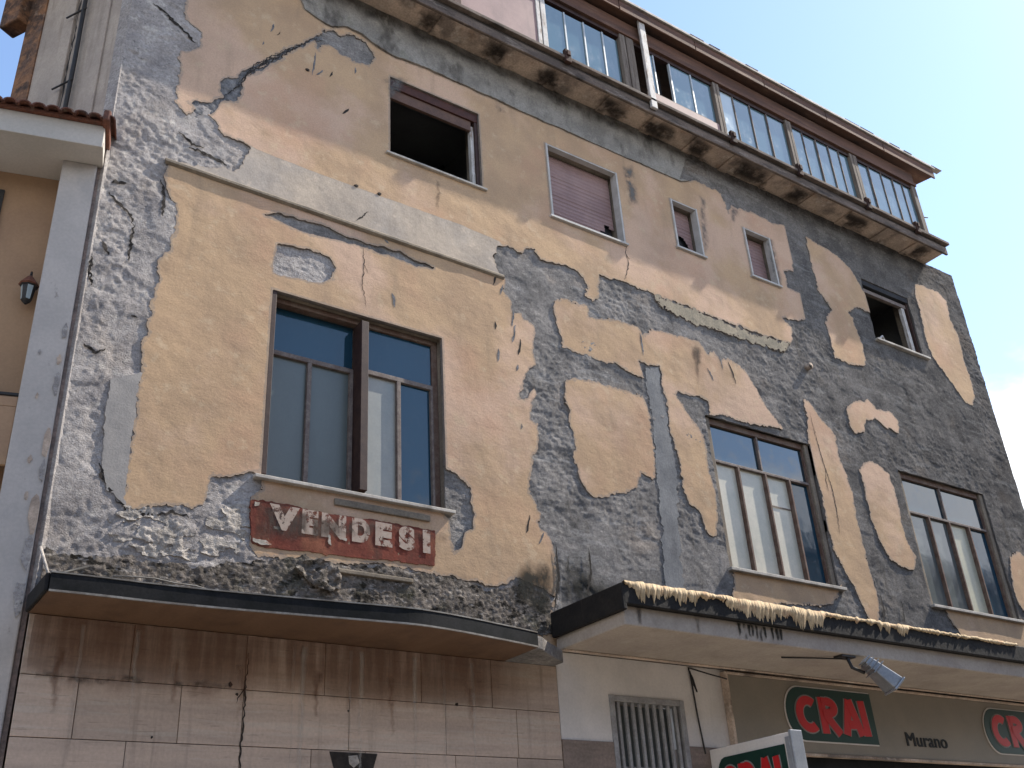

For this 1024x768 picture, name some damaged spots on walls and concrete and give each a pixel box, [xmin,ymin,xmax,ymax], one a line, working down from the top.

leakage [645,122,674,140]
flaking render [273,245,335,283]
flaking render [265,214,433,269]
leakage [845,214,867,228]
flaking render [13,0,279,618]
flaking render [301,0,1024,647]
leakage [517,547,604,611]
leakage [622,580,1018,646]
crack [236,665,248,768]
flaking render [897,689,1024,704]